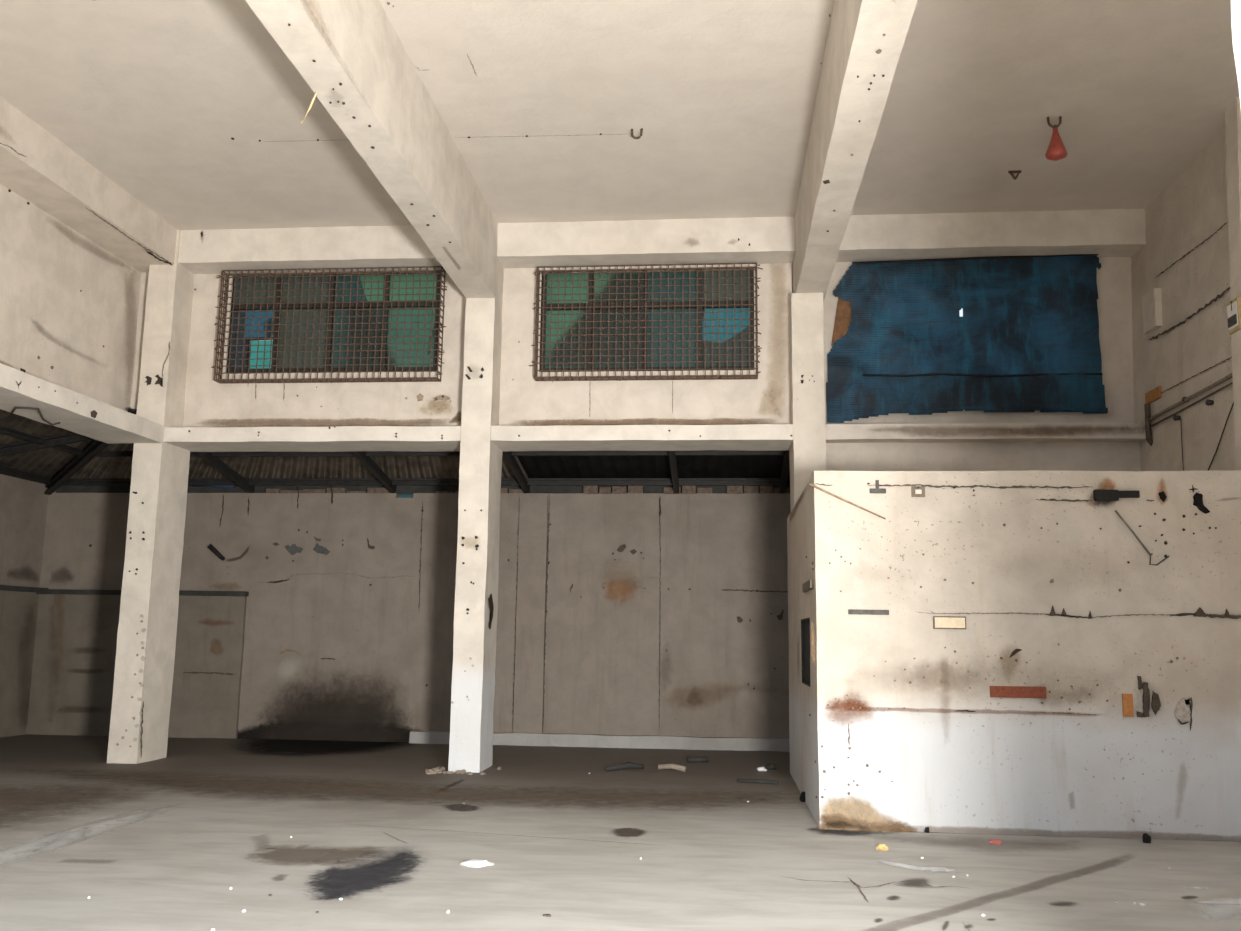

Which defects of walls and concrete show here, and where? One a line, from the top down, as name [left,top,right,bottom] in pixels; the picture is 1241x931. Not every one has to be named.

corrosion [827,695,918,711]